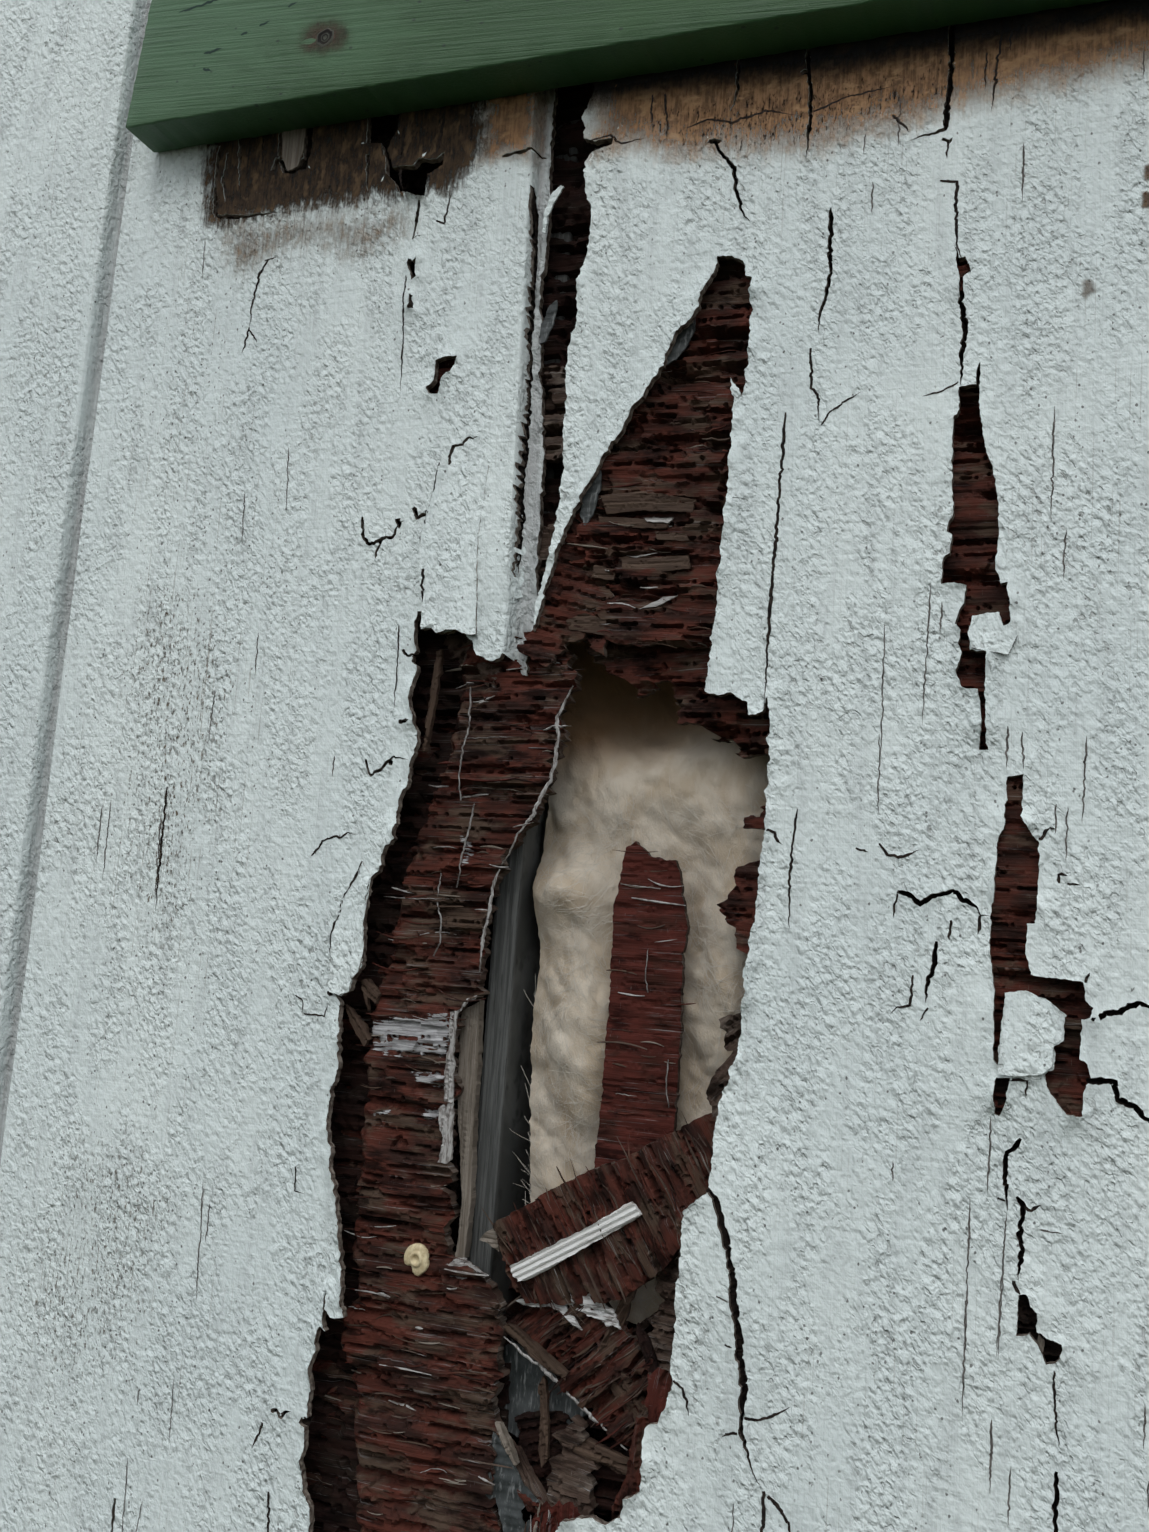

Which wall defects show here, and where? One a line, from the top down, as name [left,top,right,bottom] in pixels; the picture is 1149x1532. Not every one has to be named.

damp [201,92,542,259]
crack [591,16,1014,396]
peeling [429,359,456,394]
crack [763,212,860,708]
peeling [517,520,616,669]
peeling [968,612,1018,655]
peeling [328,862,372,995]
peeling [994,992,1064,1111]
crack [1084,973,1149,1021]
crack [1086,1077,1149,1122]
crack [706,1188,790,1449]
crack [962,1117,1062,1532]